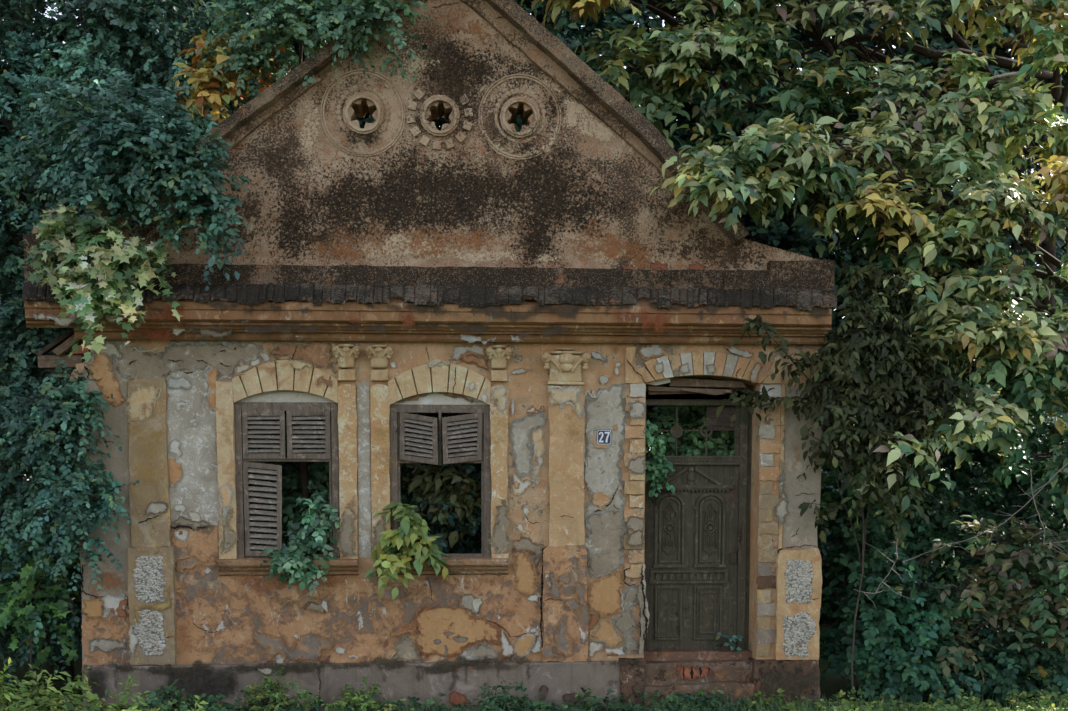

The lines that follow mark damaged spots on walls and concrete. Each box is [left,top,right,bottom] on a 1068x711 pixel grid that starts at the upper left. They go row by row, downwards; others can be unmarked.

leakage [386,51,440,101]
leakage [297,103,328,160]
leakage [519,133,557,160]
leakage [541,75,639,155]
leakage [361,228,626,265]
peeling [427,334,496,370]
peeling [168,440,183,488]
flaking render [144,500,201,542]
flaking render [398,351,647,657]
peeling [383,593,575,672]